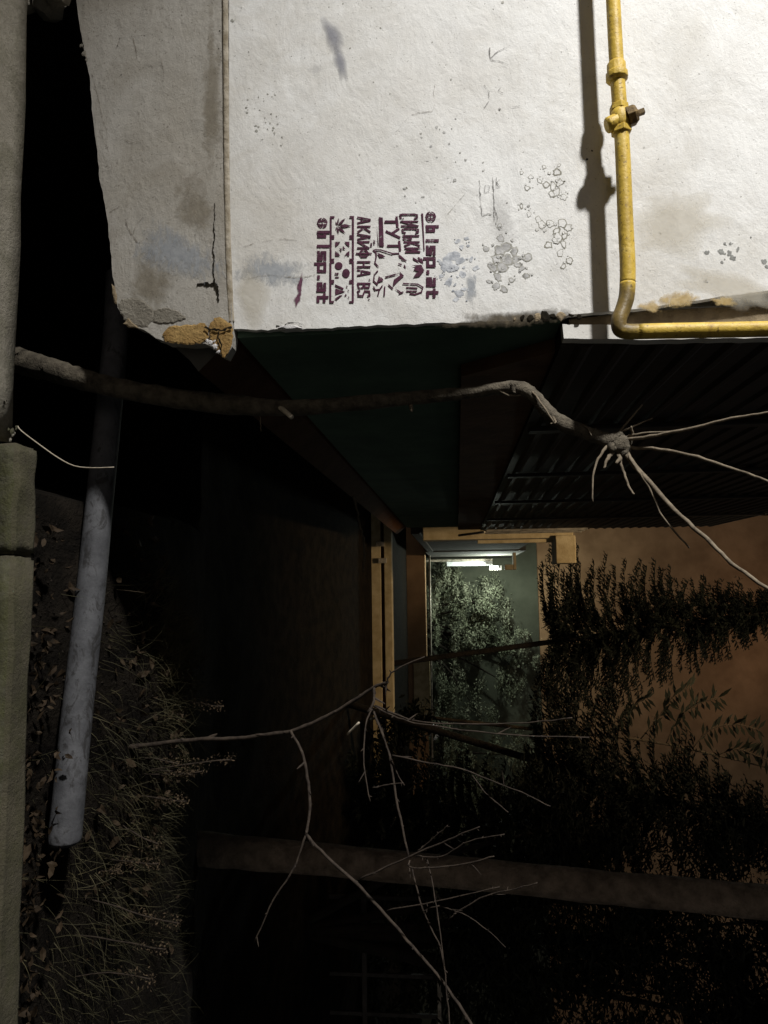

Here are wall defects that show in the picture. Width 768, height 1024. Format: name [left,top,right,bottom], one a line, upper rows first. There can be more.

damp [326,26,344,72]
crack [197,203,219,302]
spalling [112,285,234,358]